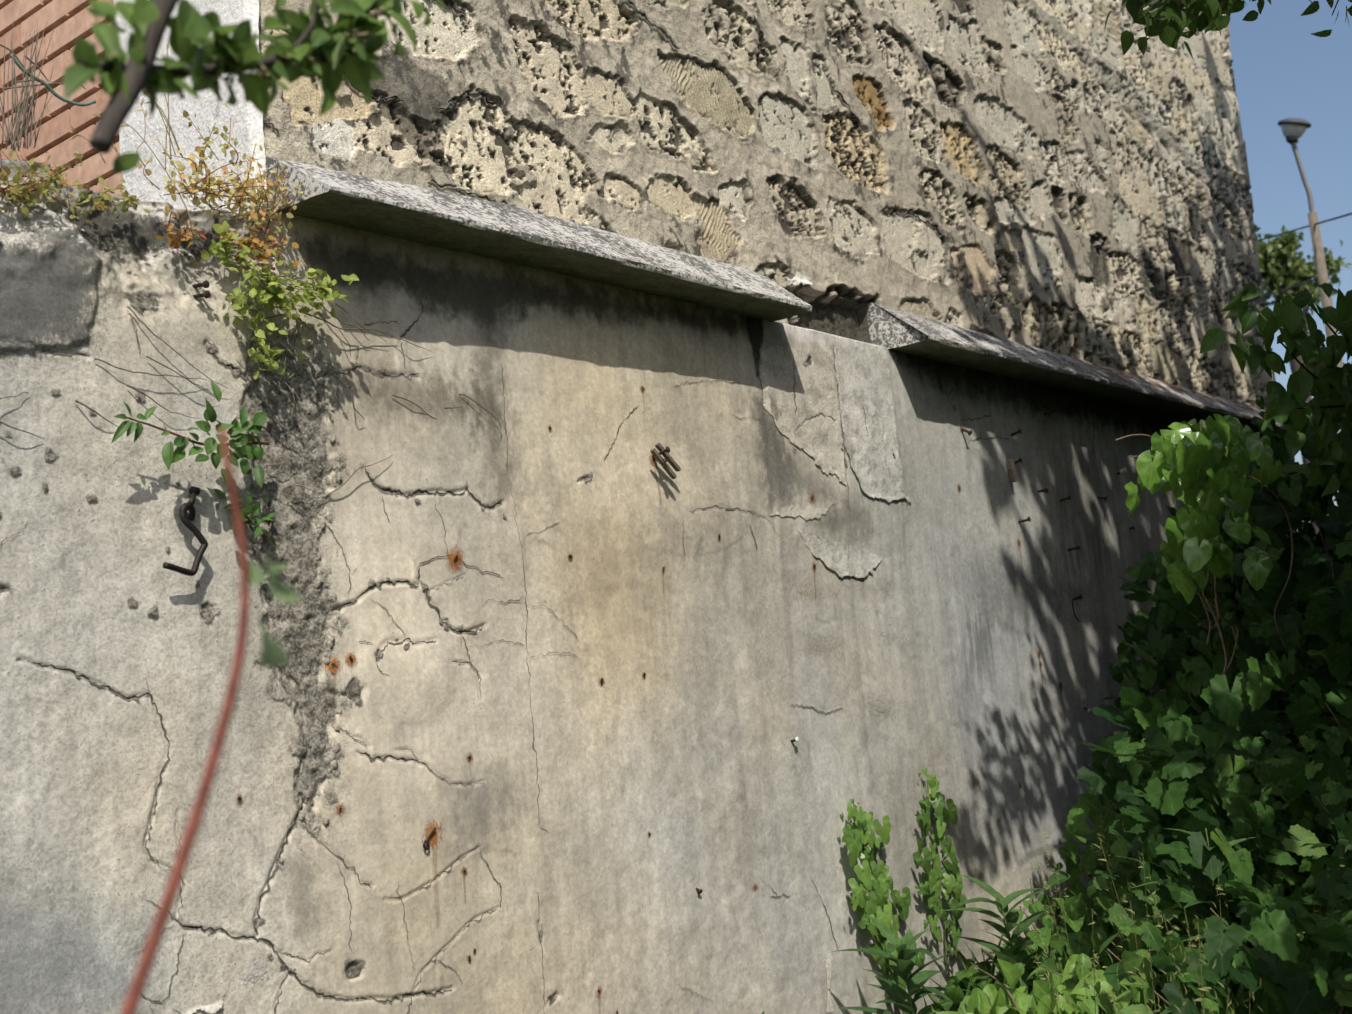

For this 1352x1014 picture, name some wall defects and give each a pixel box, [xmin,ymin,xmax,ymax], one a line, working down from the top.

leakage [305,239,763,376]
flaking render [758,345,912,503]
leakage [896,352,1200,433]
flaking render [235,317,363,848]
corrosion [325,653,356,673]
crack [326,367,579,833]
corrosion [447,549,463,573]
flaking render [770,492,882,578]
crack [21,660,545,1014]
corrosion [422,820,442,847]